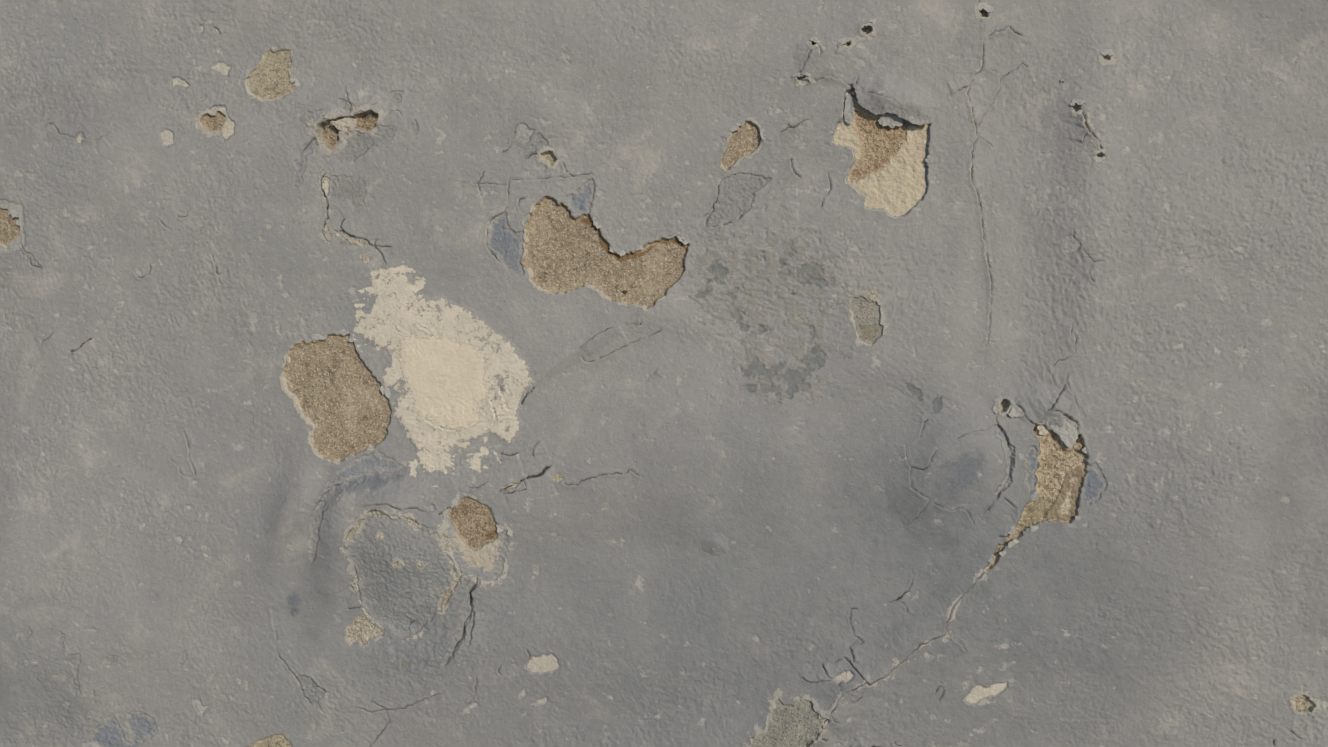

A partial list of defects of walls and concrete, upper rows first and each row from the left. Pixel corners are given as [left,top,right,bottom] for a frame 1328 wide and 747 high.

crack [303,138,391,261]
spalling [487,178,690,311]
peeling [703,116,771,227]
spalling [846,286,890,351]
spalling [829,82,932,218]
crack [958,0,1027,353]
spalling [279,329,392,563]
crack [905,324,1082,537]
spalling [984,394,1108,572]
peeling [339,490,518,666]
spalling [743,687,831,747]
crack [803,569,993,747]